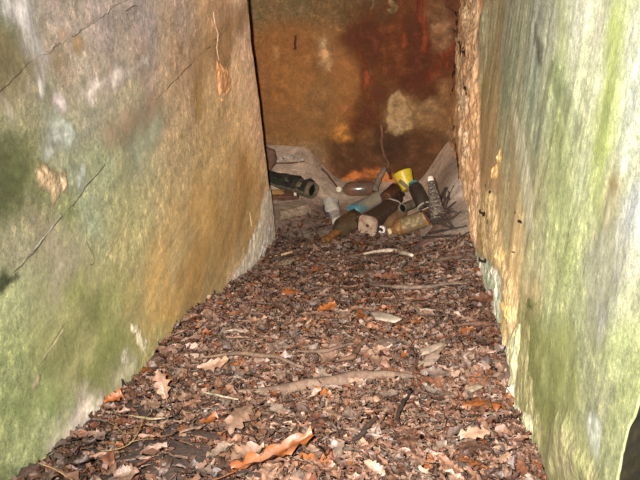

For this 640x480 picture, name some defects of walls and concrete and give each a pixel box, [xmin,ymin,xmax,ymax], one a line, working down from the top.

crack [0,0,138,92]
crack [150,28,227,101]
spalling [213,12,231,103]
rust [335,0,458,140]
spalling [36,165,68,205]
crack [0,159,106,292]
rust [341,167,396,182]